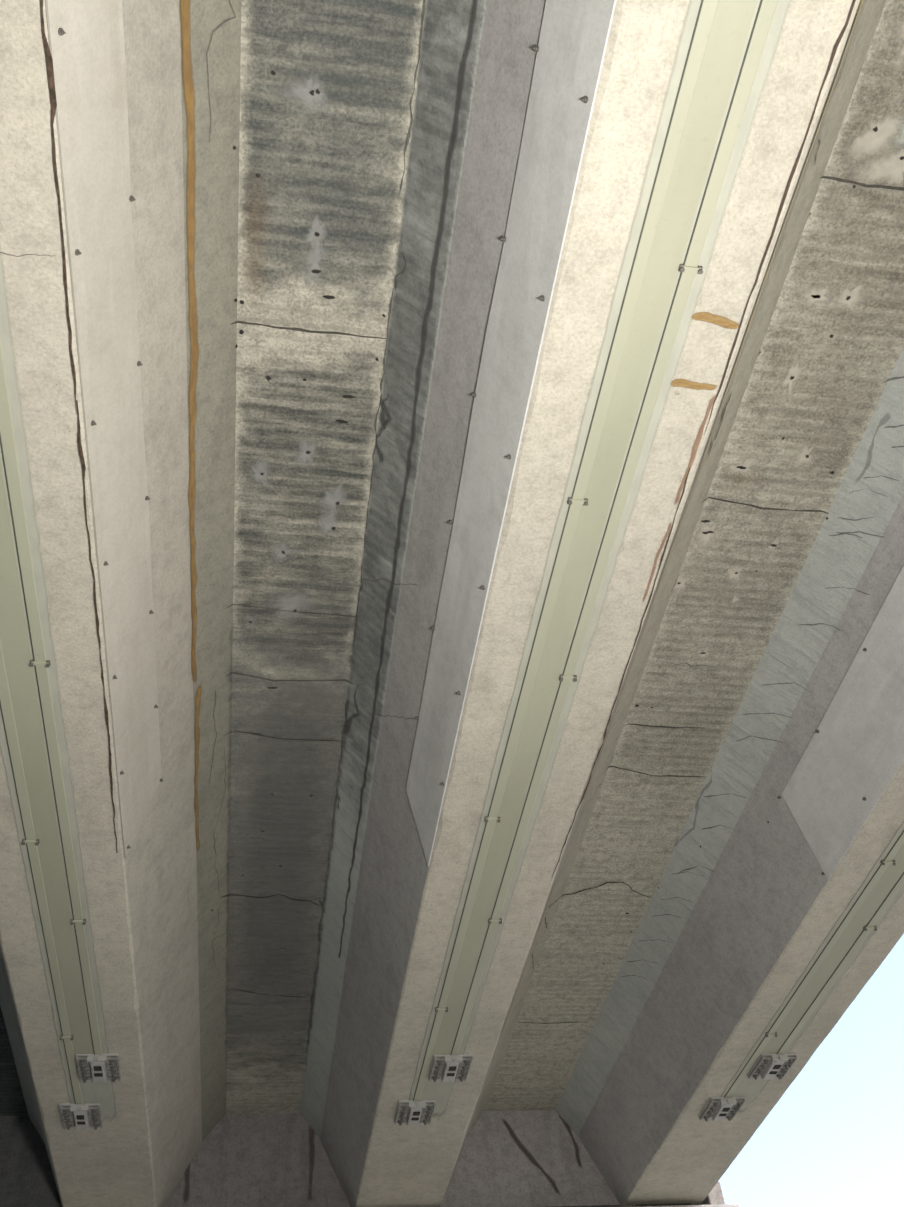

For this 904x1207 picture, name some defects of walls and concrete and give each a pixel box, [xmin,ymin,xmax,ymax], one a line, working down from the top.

crack [0,0,117,849]
corrosion [180,0,201,849]
crack [209,689,323,975]
damp [226,0,477,1064]
crack [529,468,713,979]
corrosion [586,0,864,795]
crack [738,682,809,743]
crack [704,0,856,435]
crack [829,476,899,538]